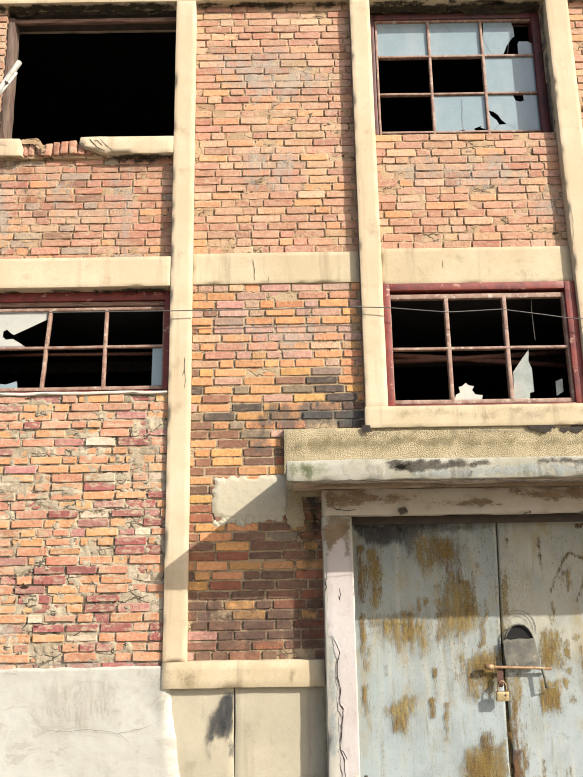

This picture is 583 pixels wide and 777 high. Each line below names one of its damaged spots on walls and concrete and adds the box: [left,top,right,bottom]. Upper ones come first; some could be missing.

water stain [369,0,555,130]
peeling [20,138,93,157]
flaking render [212,497,305,529]
flaking render [326,489,416,515]
water stain [310,471,583,489]
flaking render [449,498,501,507]
flaking render [511,485,583,501]
rust [356,530,529,777]
rust [539,588,583,716]
water stain [221,694,234,730]
crack [332,637,347,777]